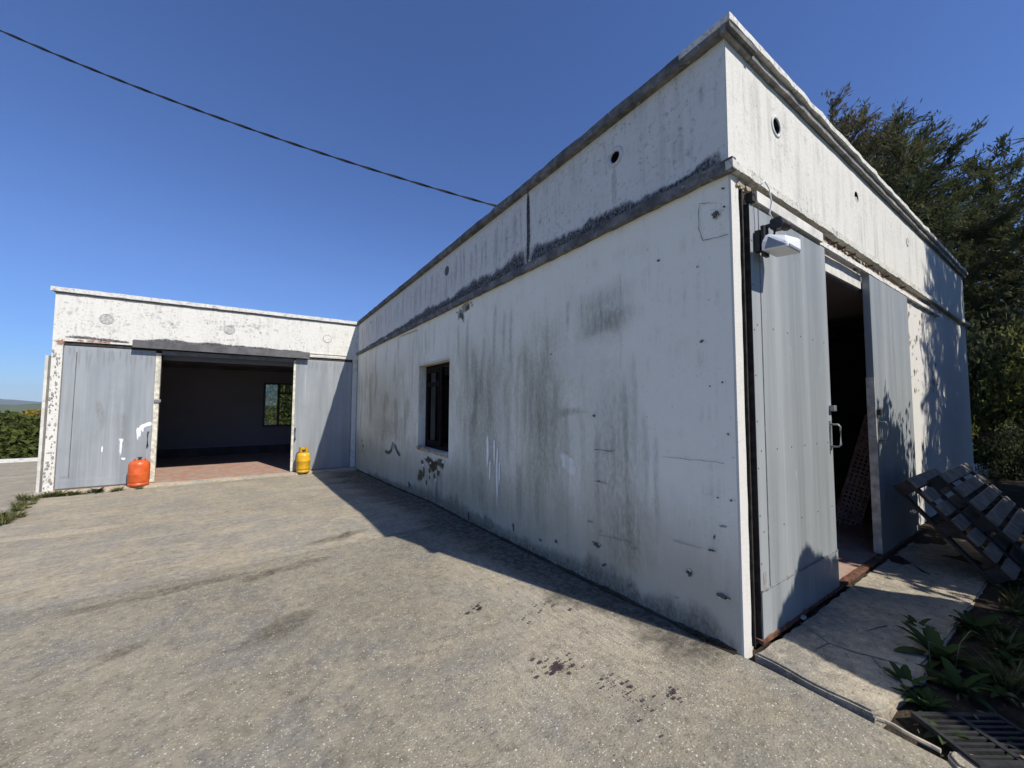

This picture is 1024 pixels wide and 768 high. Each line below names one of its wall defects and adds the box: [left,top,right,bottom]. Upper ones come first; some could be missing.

leakage [366,155,720,348]
peeling [42,349,60,489]
efflorescence [486,436,500,496]
leakage [340,471,721,652]